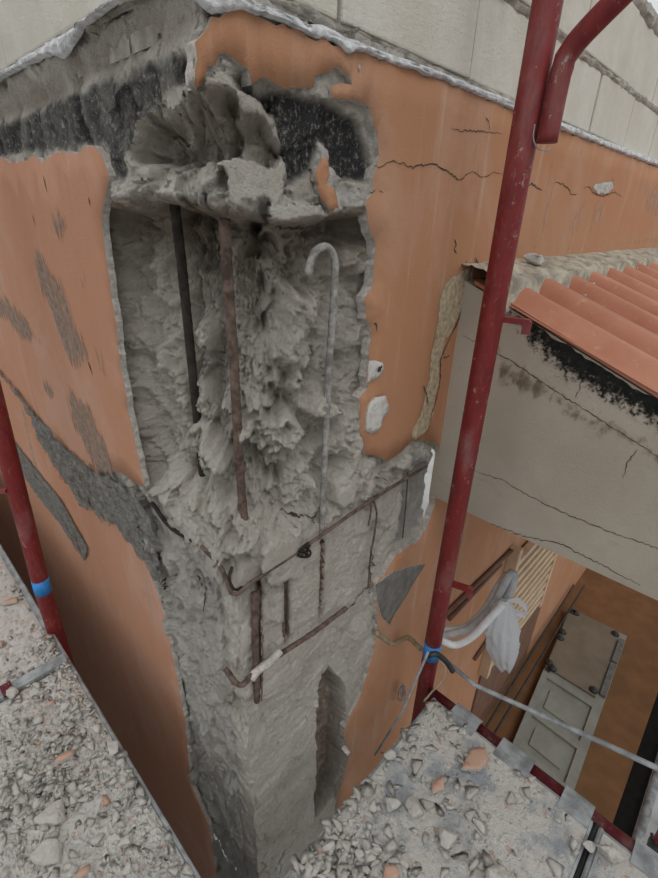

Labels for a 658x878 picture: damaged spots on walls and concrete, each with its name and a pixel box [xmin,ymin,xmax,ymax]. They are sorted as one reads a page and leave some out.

crack [375,160,501,180]
crack [529,181,622,197]
spalling [109,76,389,555]
water stain [500,367,542,396]
crack [497,352,657,475]
water stain [508,311,658,428]
crack [481,473,658,549]
crack [492,524,640,586]
peeling [373,563,425,625]
spalling [313,665,347,820]